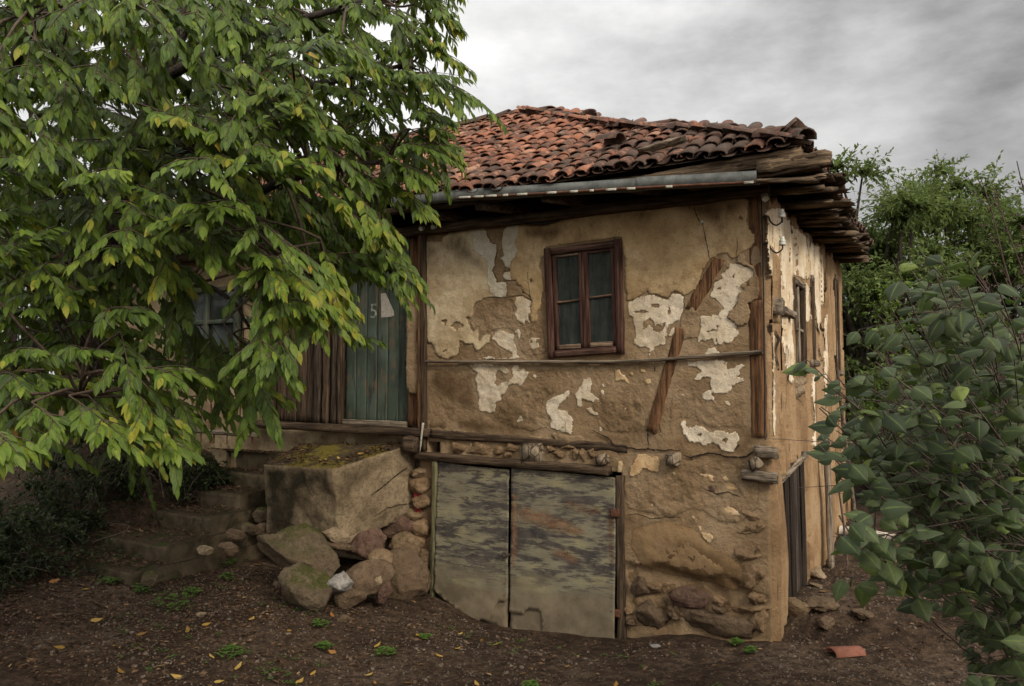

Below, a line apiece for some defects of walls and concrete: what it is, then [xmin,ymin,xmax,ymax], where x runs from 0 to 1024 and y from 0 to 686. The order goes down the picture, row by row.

spalling [469,225,546,413]
spalling [545,369,651,434]
spalling [617,421,759,543]
flaking render [628,207,829,446]